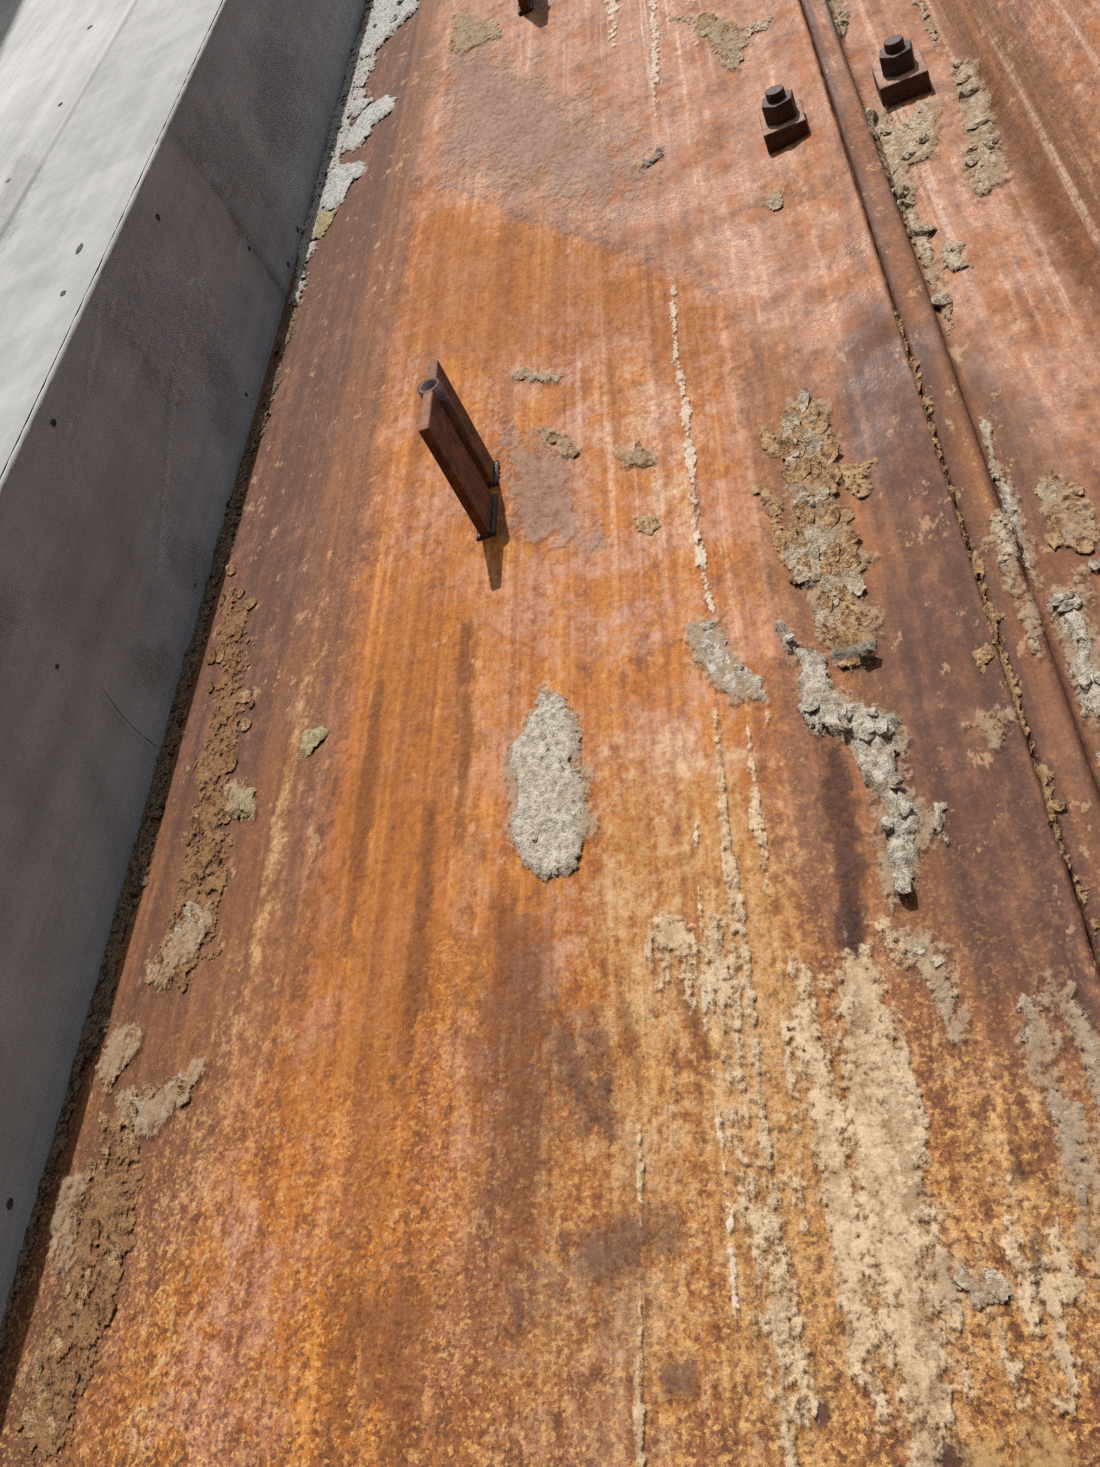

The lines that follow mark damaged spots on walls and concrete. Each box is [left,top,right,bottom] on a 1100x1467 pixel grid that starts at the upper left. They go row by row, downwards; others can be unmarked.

corrosion [647,4,772,70]
corrosion [511,367,564,383]
corrosion [536,425,579,459]
corrosion [615,441,656,468]
corrosion [751,386,882,669]
corrosion [893,307,1100,942]
corrosion [139,564,258,996]
corrosion [821,743,867,959]
corrosion [13,1022,206,1467]
corrosion [1030,1235,1048,1293]
corrosion [796,1399,829,1427]
corrosion [933,1441,968,1467]